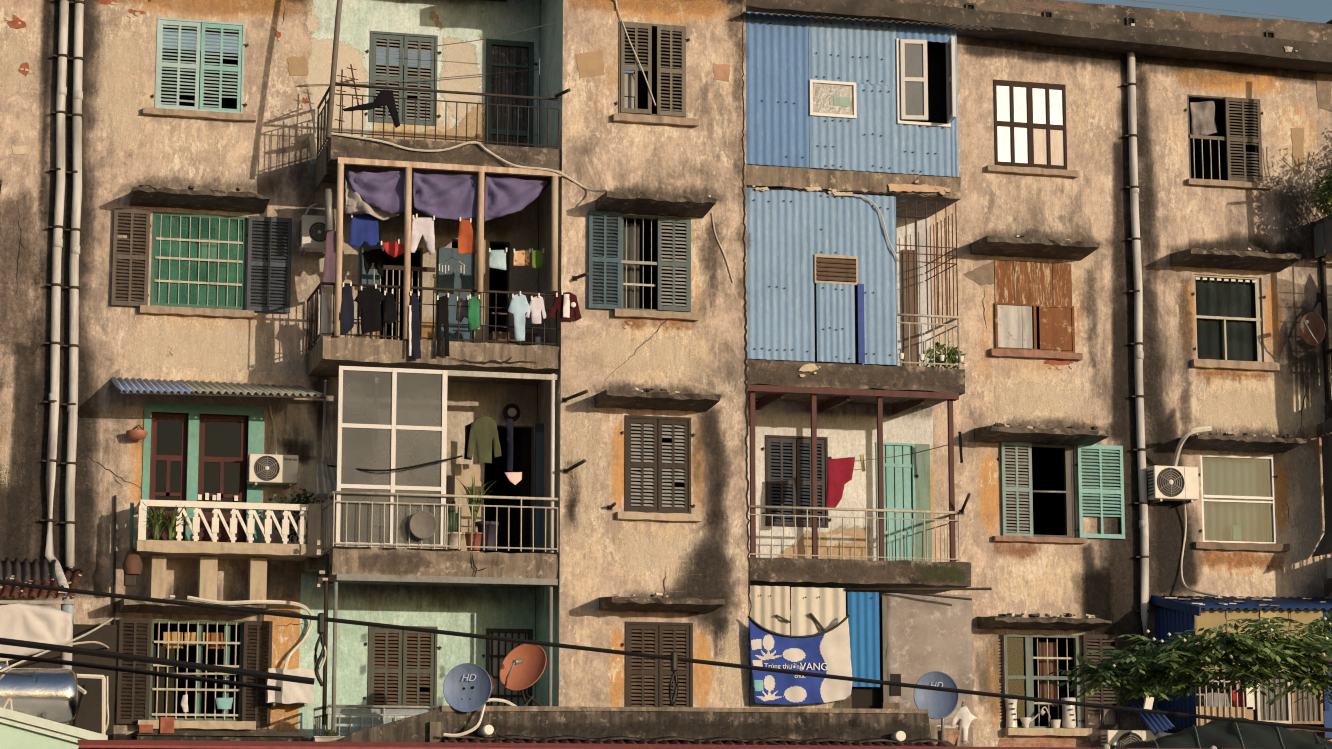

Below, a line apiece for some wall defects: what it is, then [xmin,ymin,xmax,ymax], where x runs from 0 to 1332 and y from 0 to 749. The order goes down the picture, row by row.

peeling [298,2,485,162]
leakage [0,0,146,591]
leakage [129,321,274,378]
leakage [620,409,745,708]
leakage [964,37,1318,712]
leakage [1297,459,1324,577]